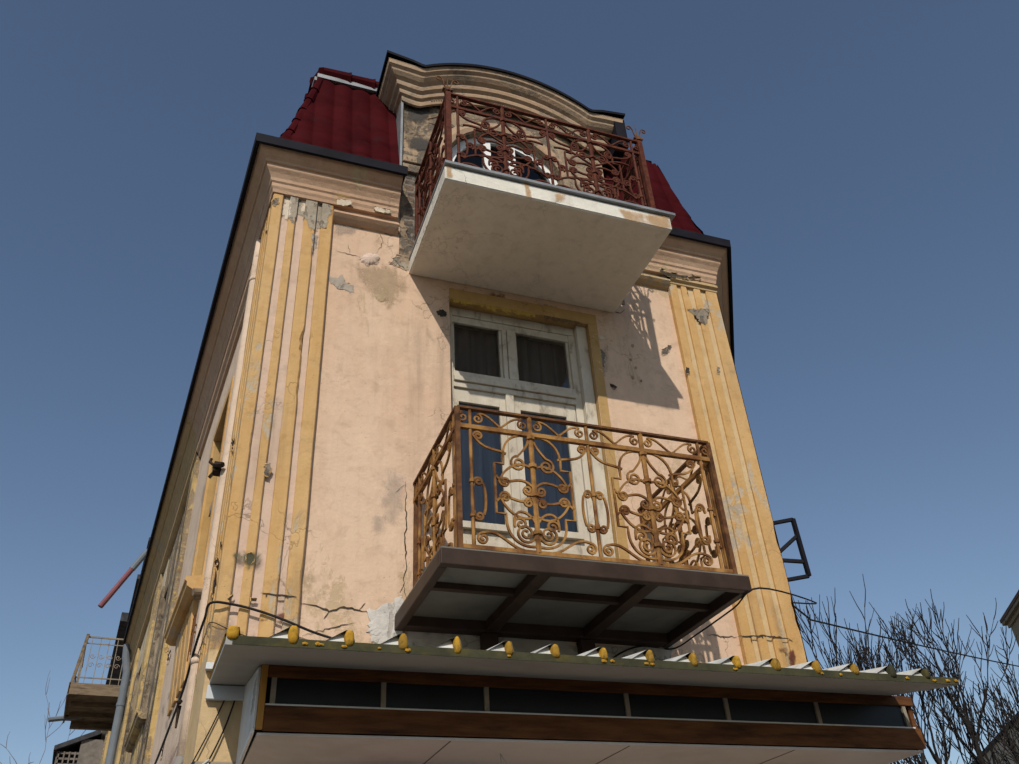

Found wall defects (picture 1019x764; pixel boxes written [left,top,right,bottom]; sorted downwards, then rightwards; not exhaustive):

peeling [271,196,353,254]
peeling [328,275,354,293]
flaking render [687,308,710,325]
crack [396,482,407,595]
flaking render [119,477,192,764]
crack [262,593,367,636]